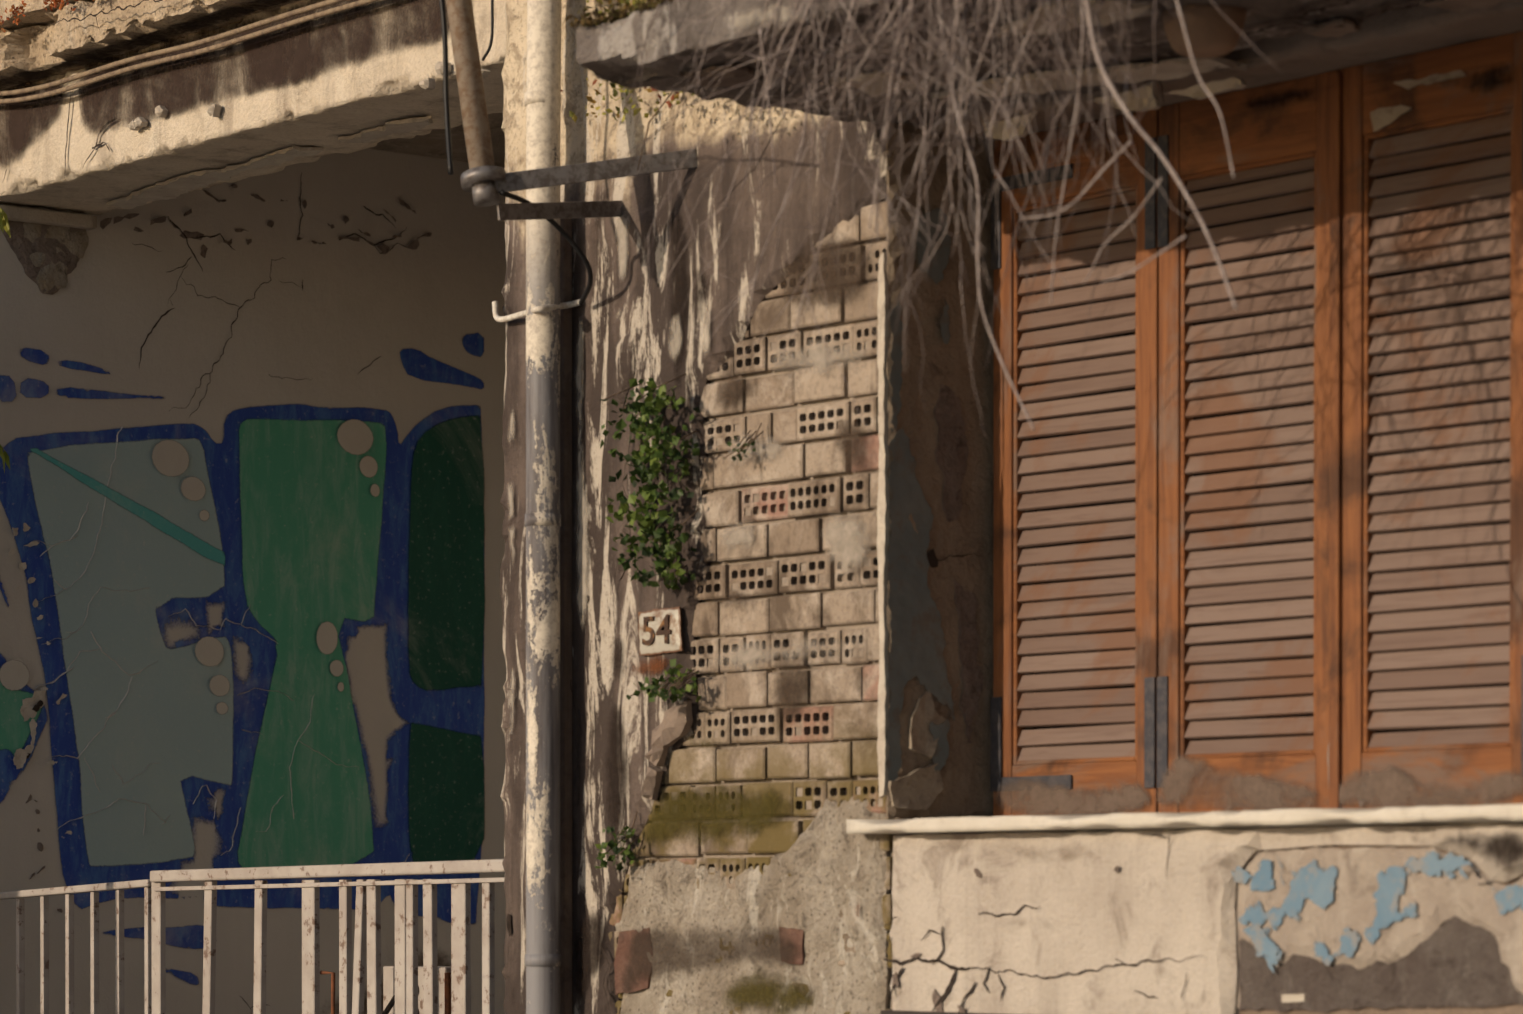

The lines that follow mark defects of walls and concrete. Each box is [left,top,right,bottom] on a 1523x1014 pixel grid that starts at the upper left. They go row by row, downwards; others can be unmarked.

damp [0,0,450,165]
peeling [1370,70,1466,132]
flaking render [2,115,433,295]
crack [132,173,303,415]
crack [170,607,278,644]
peeling [886,301,955,810]
crack [57,688,358,855]
flaking render [614,928,653,995]
flaking render [779,927,805,965]
crack [978,905,1039,917]
crack [883,917,1204,1011]
peeling [1231,847,1523,1012]